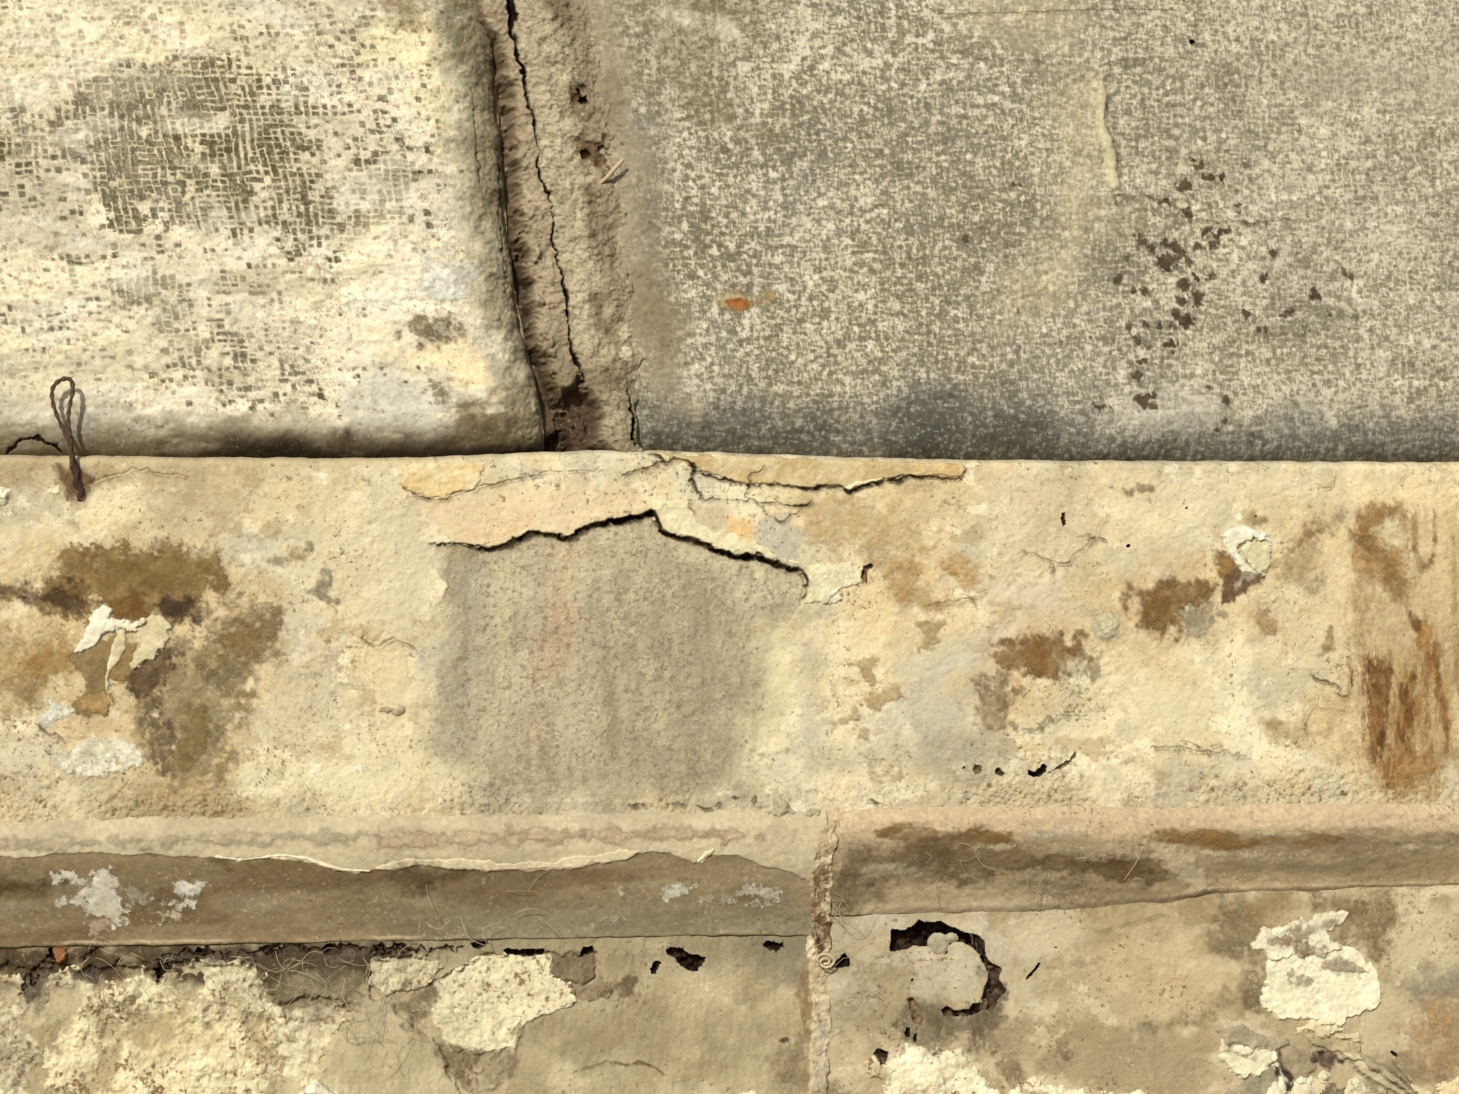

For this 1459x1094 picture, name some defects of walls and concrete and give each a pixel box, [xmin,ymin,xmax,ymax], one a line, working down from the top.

crack [473,119,508,293]
crack [505,0,584,383]
rust [716,291,775,311]
water stain [0,537,287,785]
spalling [441,498,874,792]
rust [1350,500,1459,799]
water stain [6,865,206,936]
water stain [595,879,783,922]
water stain [832,823,1168,915]
spalling [0,946,355,1094]
spalling [368,952,578,1094]
spalling [863,1043,1146,1094]